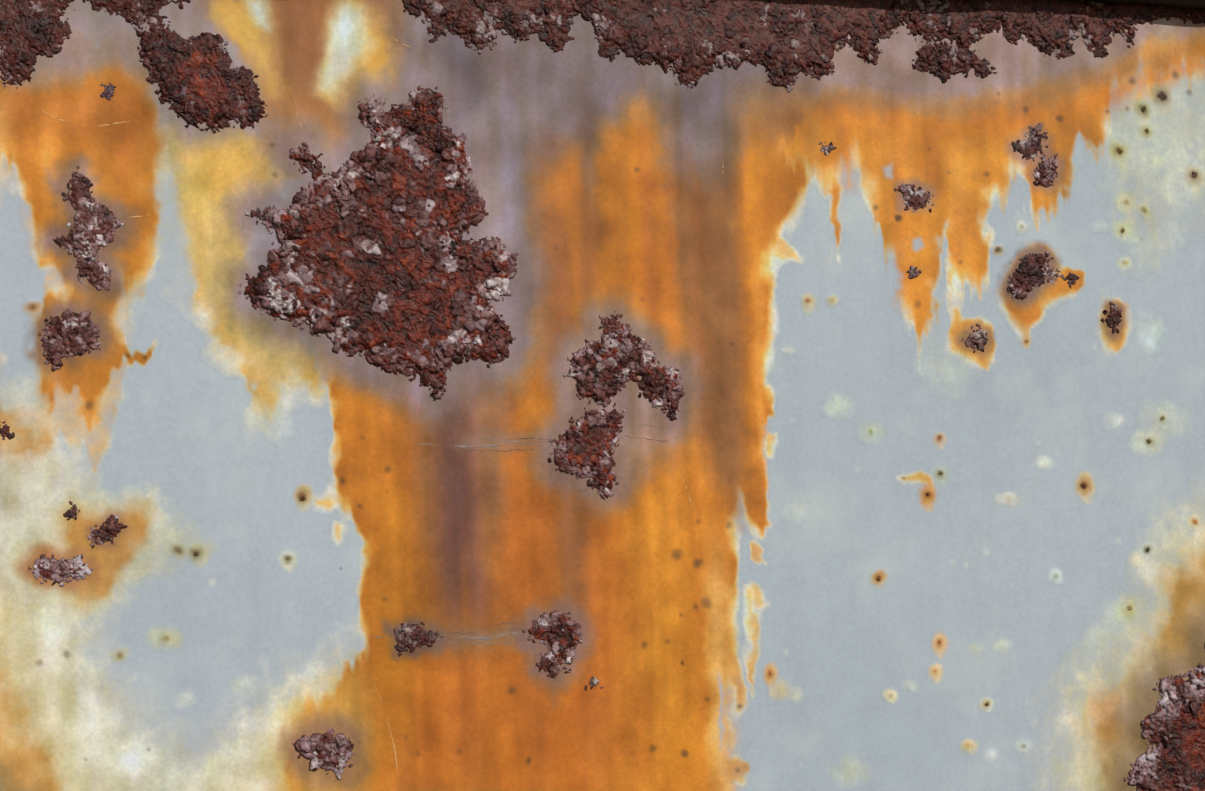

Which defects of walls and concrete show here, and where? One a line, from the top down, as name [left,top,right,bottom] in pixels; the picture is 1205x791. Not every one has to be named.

corrosion [82,0,191,25]
corrosion [134,12,268,133]
corrosion [912,41,998,83]
corrosion [0,0,166,476]
corrosion [894,183,931,212]
corrosion [1011,123,1048,161]
corrosion [1033,153,1058,188]
corrosion [909,301,998,404]
corrosion [992,239,1088,350]
corrosion [1094,287,1135,360]
corrosion [8,476,219,628]
corrosion [1013,464,1205,791]